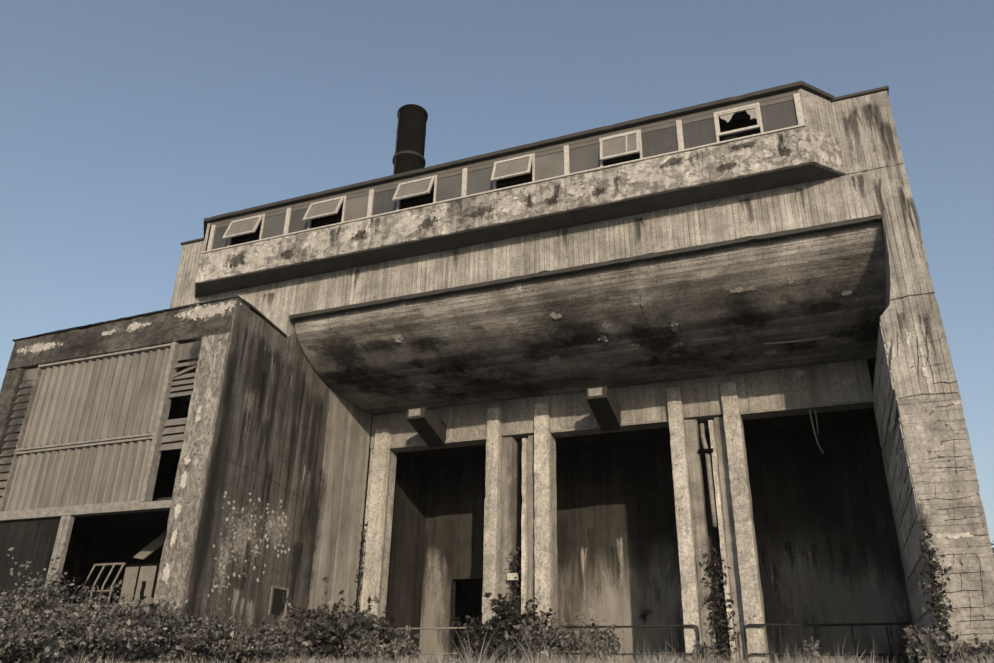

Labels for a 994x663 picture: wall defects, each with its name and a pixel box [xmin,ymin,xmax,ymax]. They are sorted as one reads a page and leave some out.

water stain [844,105,895,156]
water stain [900,189,918,223]
peeling [17,342,63,355]
peeling [101,322,152,337]
peeling [175,301,242,321]
water stain [323,337,410,397]
water stain [410,339,574,403]
spalling [180,453,191,488]
water stain [188,331,324,626]
crack [897,330,994,635]
spalling [170,503,182,548]
spalling [161,563,171,586]